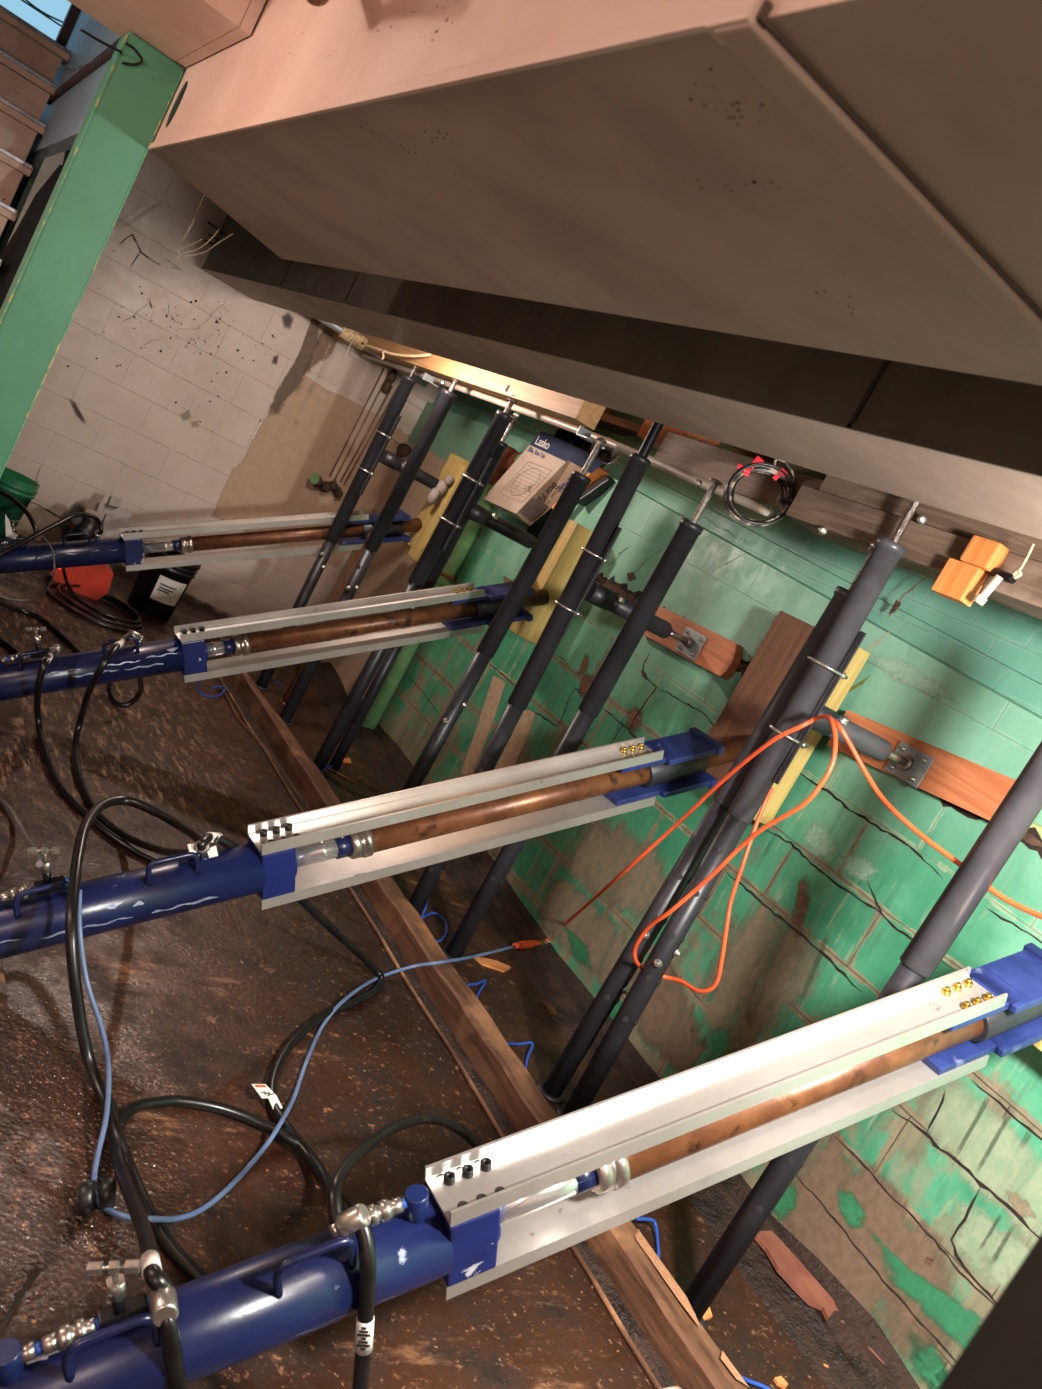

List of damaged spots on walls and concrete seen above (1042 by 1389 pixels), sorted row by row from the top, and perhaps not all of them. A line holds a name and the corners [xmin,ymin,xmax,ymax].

peeling [539,821,665,984]
peeling [609,964,644,1019]
peeling [638,903,818,1072]
crack [726,871,864,994]
crack [759,826,912,940]
crack [800,773,942,878]
crack [936,796,989,822]
crack [987,908,1042,943]
crack [1020,827,1042,859]
crack [796,1175,956,1361]
peeling [754,1087,1042,1389]
crack [837,1081,1042,1304]